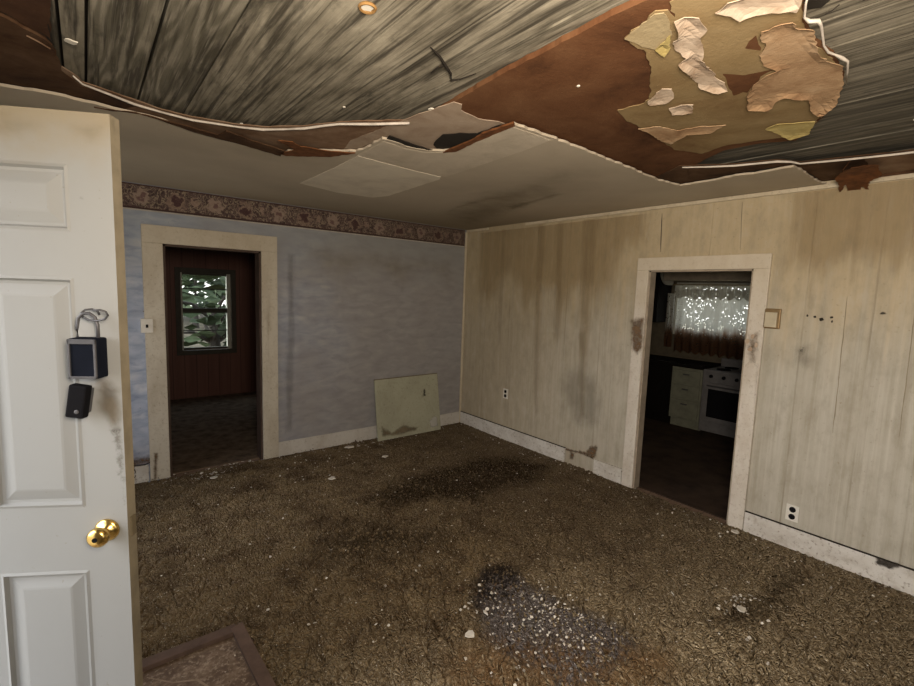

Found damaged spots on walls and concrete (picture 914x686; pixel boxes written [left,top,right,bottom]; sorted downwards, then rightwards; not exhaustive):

crack [430,47,476,82]
peeling [835,160,882,192]
leakage [566,447,597,459]